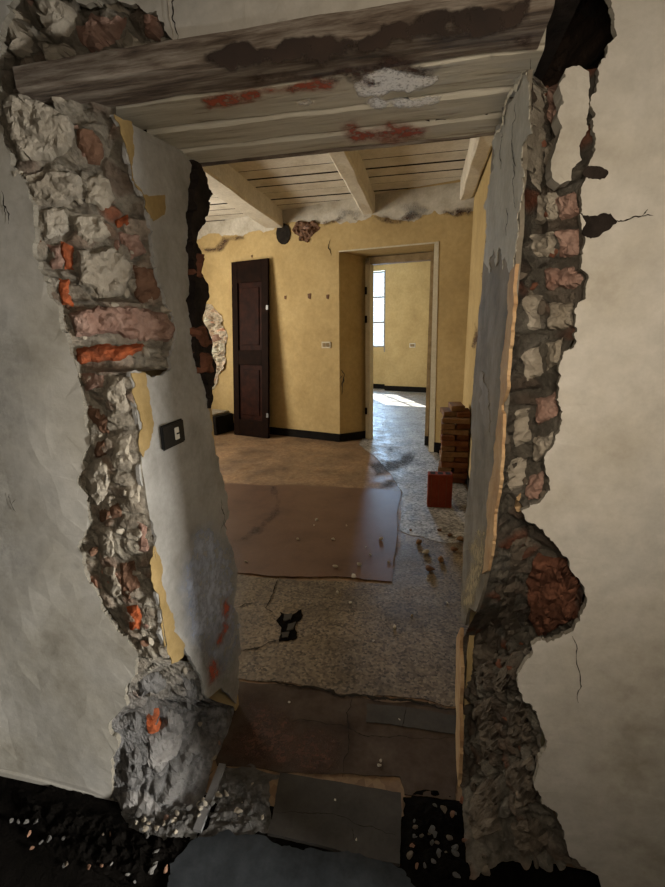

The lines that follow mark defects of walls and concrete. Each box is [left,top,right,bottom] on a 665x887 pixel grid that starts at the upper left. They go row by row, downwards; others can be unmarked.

spalling [0,0,234,821]
crack [167,0,178,40]
spalling [292,220,320,243]
spalling [455,0,617,880]